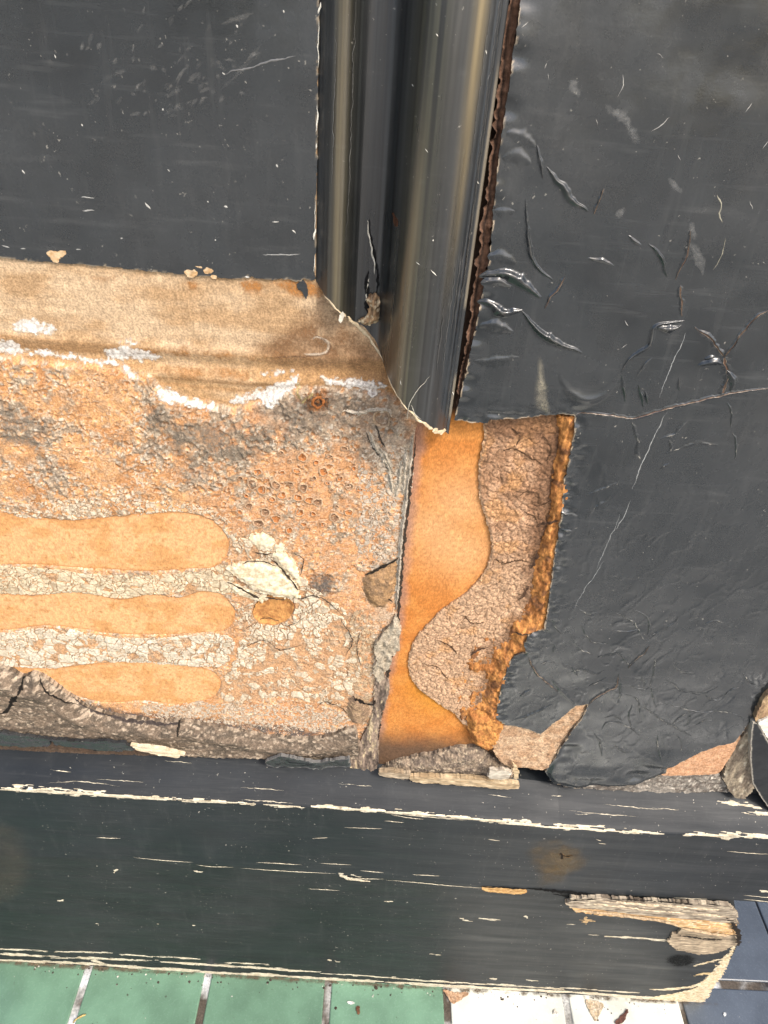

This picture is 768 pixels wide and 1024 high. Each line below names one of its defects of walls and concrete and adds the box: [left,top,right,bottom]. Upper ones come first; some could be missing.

crack [456,0,520,408]
water stain [0,317,160,379]
water stain [229,319,368,410]
rust [296,383,329,411]
efflorescence [320,375,387,398]
crack [576,230,768,458]
crack [365,425,416,621]
peeling [0,497,375,733]
peeling [408,414,587,770]
crack [0,675,184,737]
spalling [0,770,674,844]
spalling [0,946,736,1002]